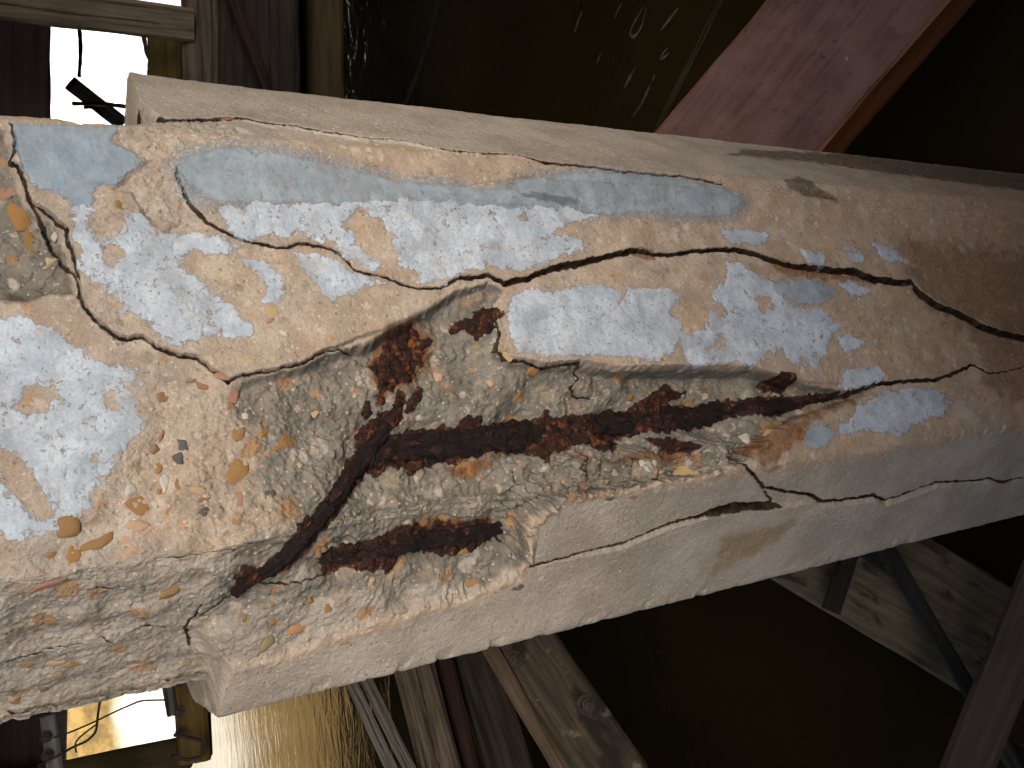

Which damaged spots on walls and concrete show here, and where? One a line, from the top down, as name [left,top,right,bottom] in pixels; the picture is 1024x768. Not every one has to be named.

crack [7,123,349,385]
crack [137,111,722,186]
spalling [0,72,952,724]
rust [448,307,505,341]
rust [230,322,855,599]
crack [175,166,1024,408]
crack [530,451,1023,567]